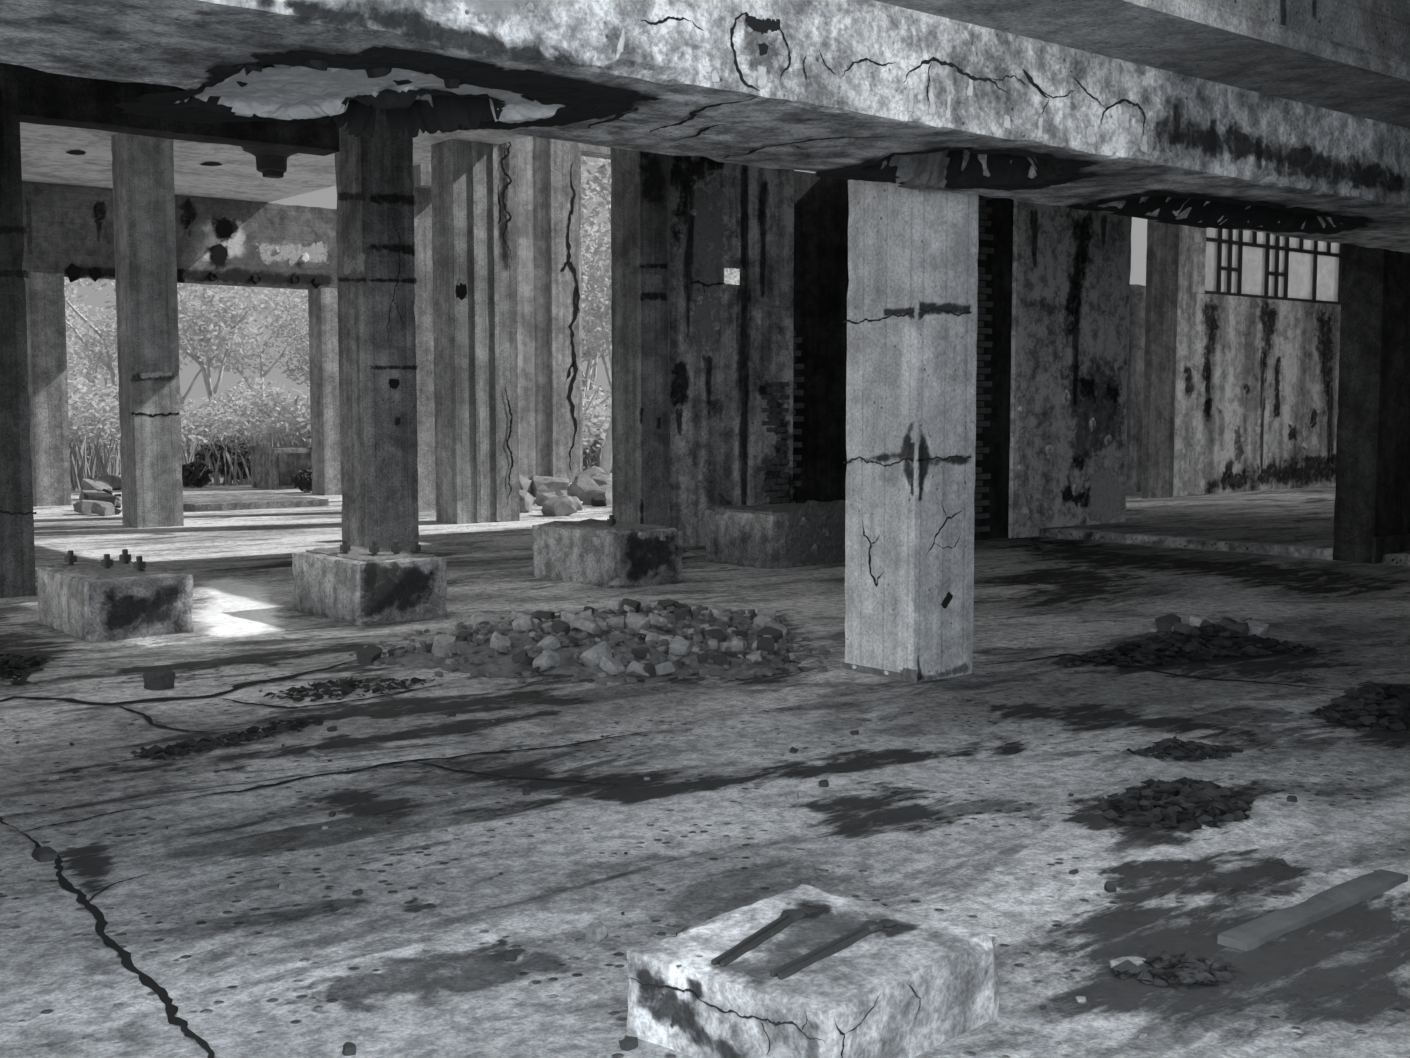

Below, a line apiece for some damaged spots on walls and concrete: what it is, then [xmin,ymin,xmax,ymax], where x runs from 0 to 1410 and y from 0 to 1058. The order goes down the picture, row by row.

spalling [113,46,662,138]
crack [642,16,704,31]
spalling [730,12,791,91]
spalling [1065,190,1375,235]
crack [560,162,580,473]
water stain [1065,213,1107,405]
water stain [1201,300,1219,421]
water stain [1205,299,1336,494]
crack [860,513,883,587]
crack [926,500,961,555]
crack [0,730,663,1058]
water stain [1037,778,1410,1037]